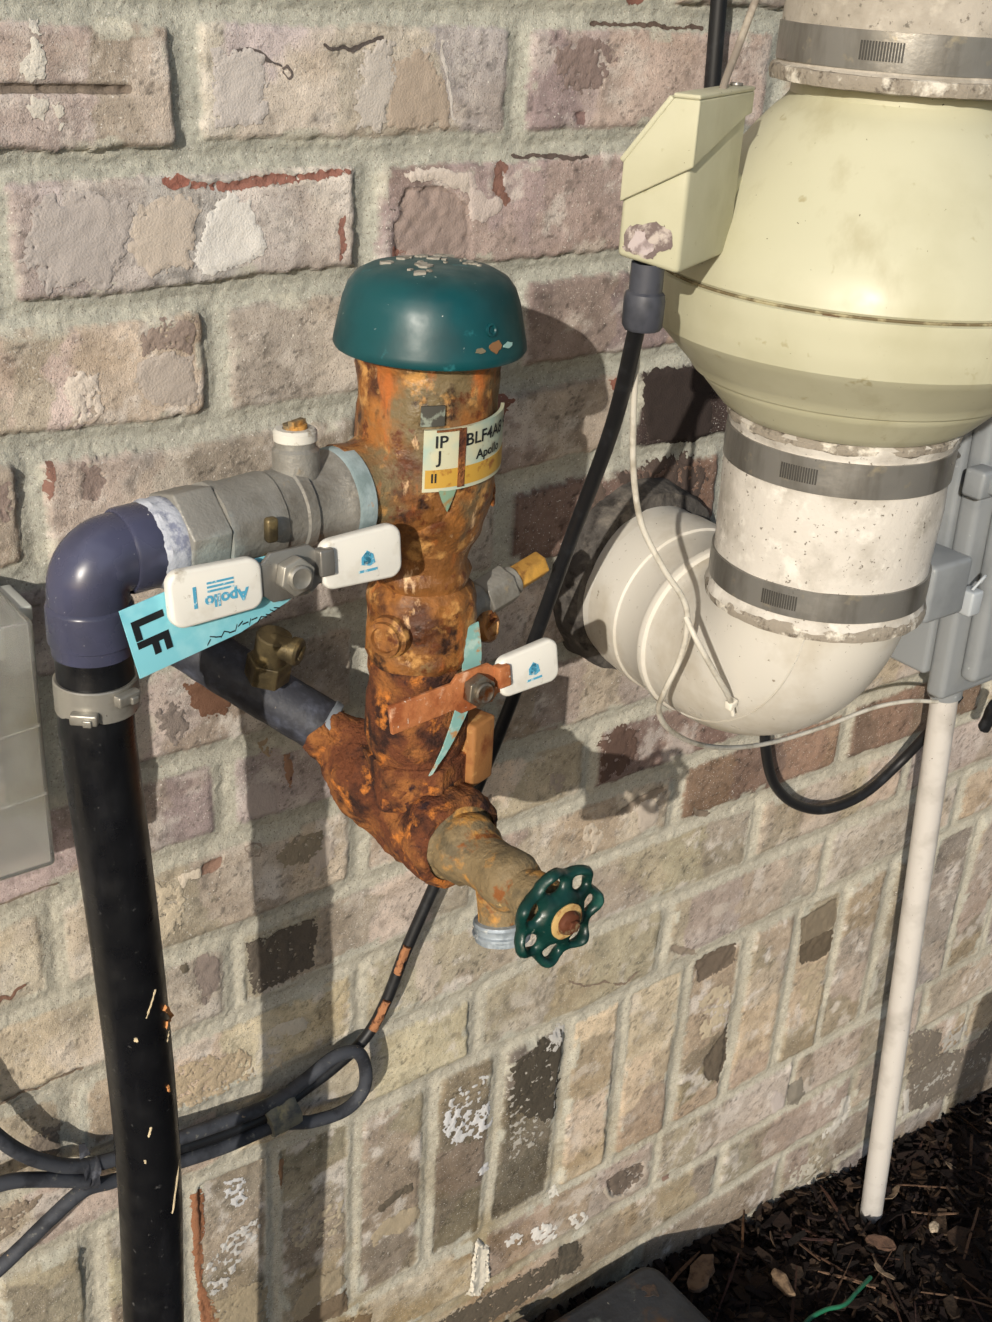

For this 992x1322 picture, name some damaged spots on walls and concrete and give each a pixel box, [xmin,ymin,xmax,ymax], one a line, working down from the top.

crack [323,35,384,53]
spalling [162,168,351,193]
spalling [338,216,347,261]
spalling [392,159,511,259]
leakage [442,1023,564,1159]
rust [189,1189,219,1322]